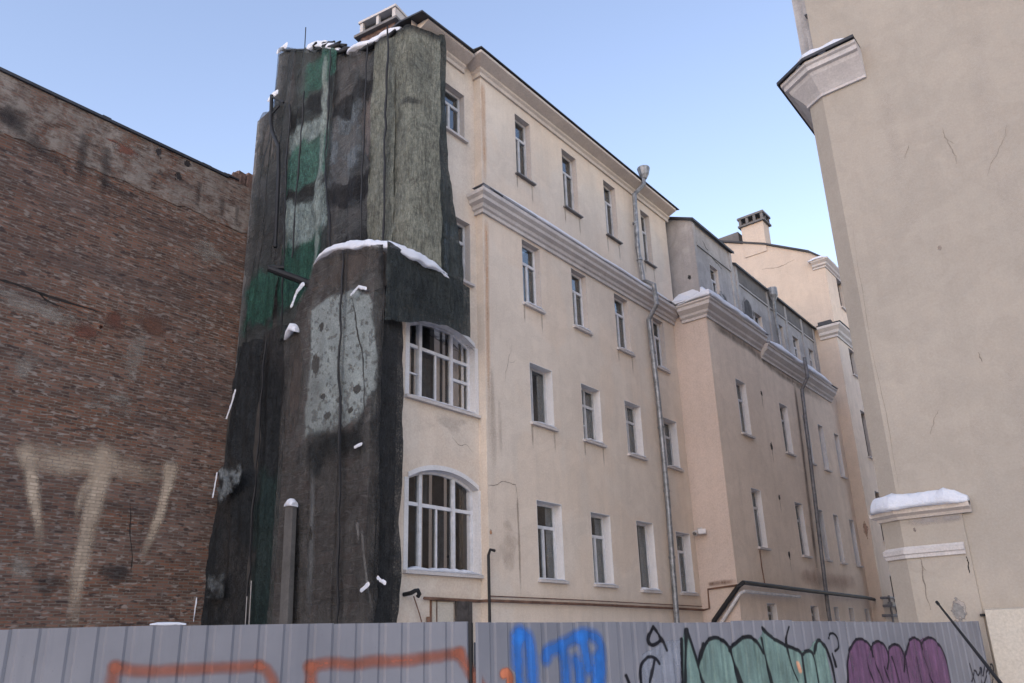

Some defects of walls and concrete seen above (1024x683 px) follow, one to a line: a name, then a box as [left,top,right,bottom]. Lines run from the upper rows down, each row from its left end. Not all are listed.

crack [0,279,98,312]
crack [920,558,931,610]